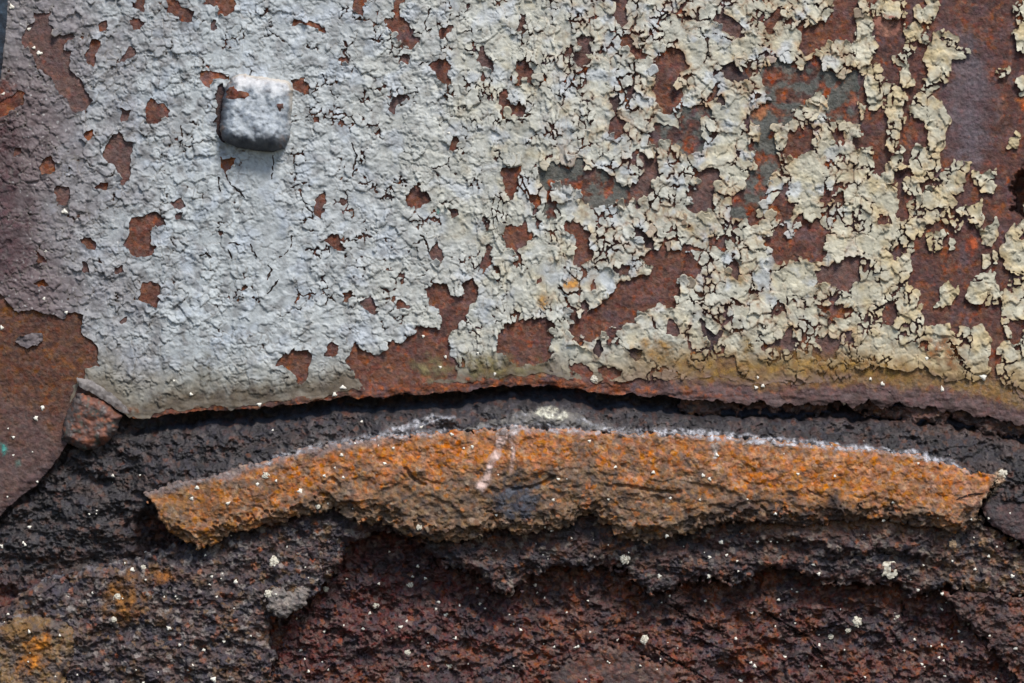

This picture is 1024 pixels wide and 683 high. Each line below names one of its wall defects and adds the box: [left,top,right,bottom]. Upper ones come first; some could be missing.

peeling [22,11,93,113]
peeling [165,0,236,31]
crack [633,0,709,61]
corrosion [873,14,901,37]
peeling [95,108,134,190]
peeling [194,66,249,177]
corrosion [752,104,768,120]
peeling [123,197,186,257]
peeling [276,0,1024,426]
corrosion [929,337,958,366]
peeling [0,294,130,515]
corrosion [0,377,1024,683]